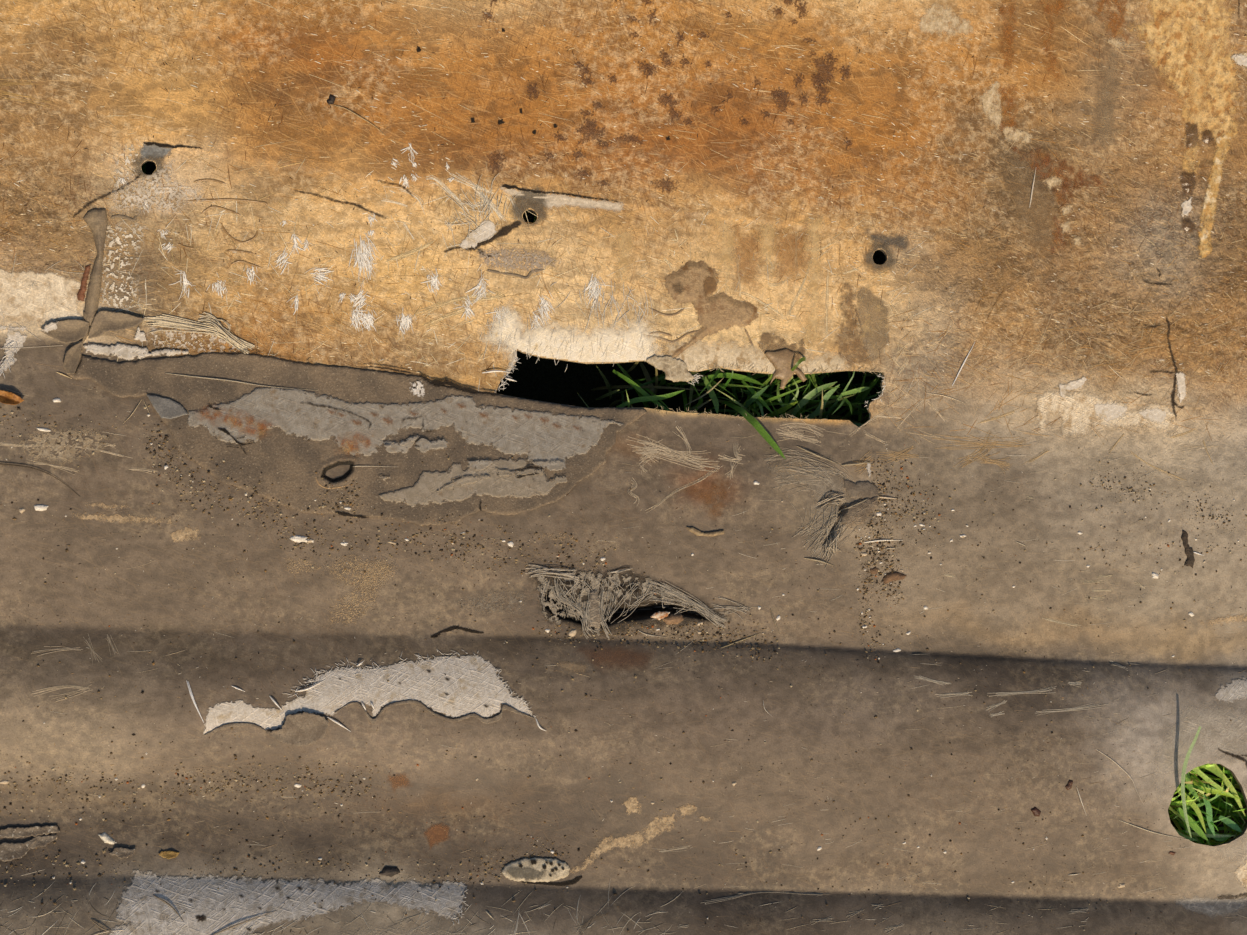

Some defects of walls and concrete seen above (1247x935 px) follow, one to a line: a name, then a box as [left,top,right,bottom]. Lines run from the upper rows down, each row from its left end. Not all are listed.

rust [573,59,595,88]
rust [637,31,712,79]
rust [739,0,852,127]
rust [544,100,644,188]
rust [658,93,692,140]
leakage [1108,0,1238,258]
rust [651,178,677,193]
spalling [795,352,850,373]
peeling [65,353,648,534]
peeling [290,535,314,543]
spalling [526,555,761,639]
crack [1218,892,1247,900]